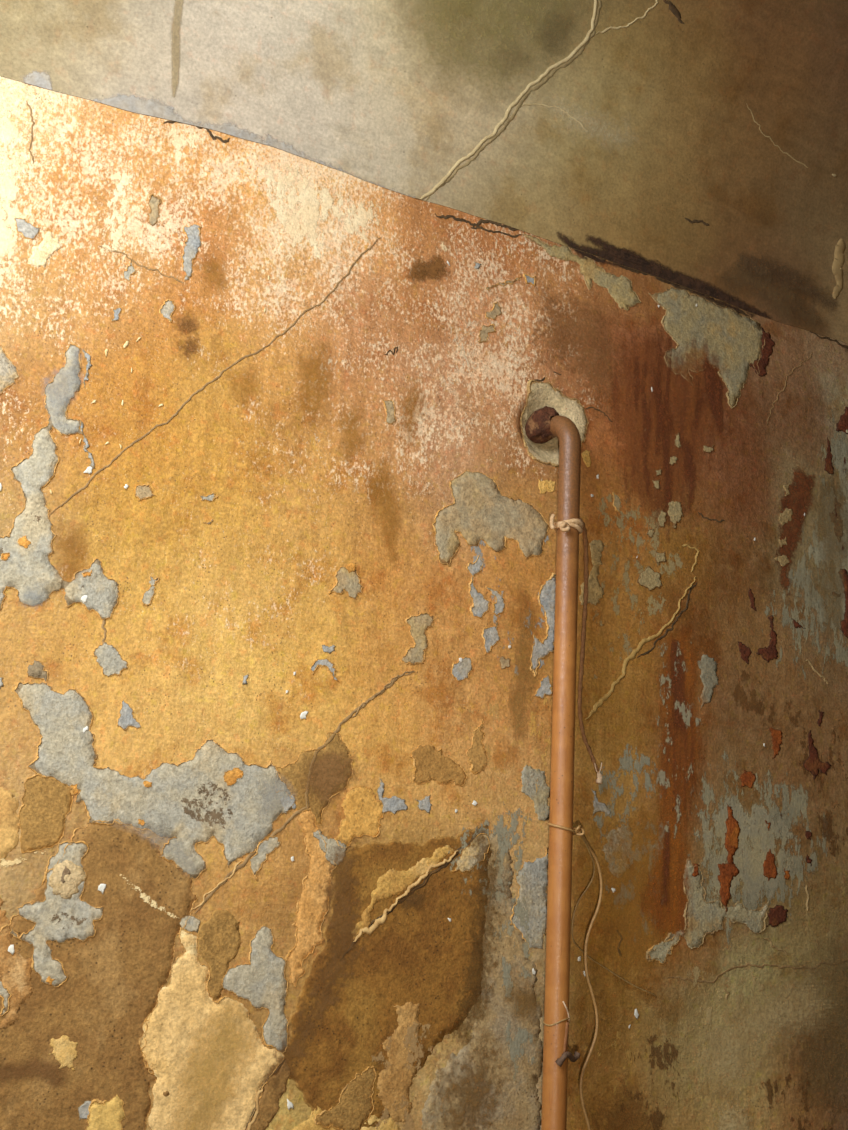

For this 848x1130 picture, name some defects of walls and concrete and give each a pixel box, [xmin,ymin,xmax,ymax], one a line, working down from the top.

crack [416,0,684,238]
peeling [0,343,119,620]
peeling [522,234,775,409]
corrosion [613,340,723,522]
peeling [738,407,848,680]
flaking render [0,470,556,1130]
corrosion [642,634,701,933]
peeling [591,710,831,964]
crack [245,1059,291,1130]
damp [685,958,833,1130]